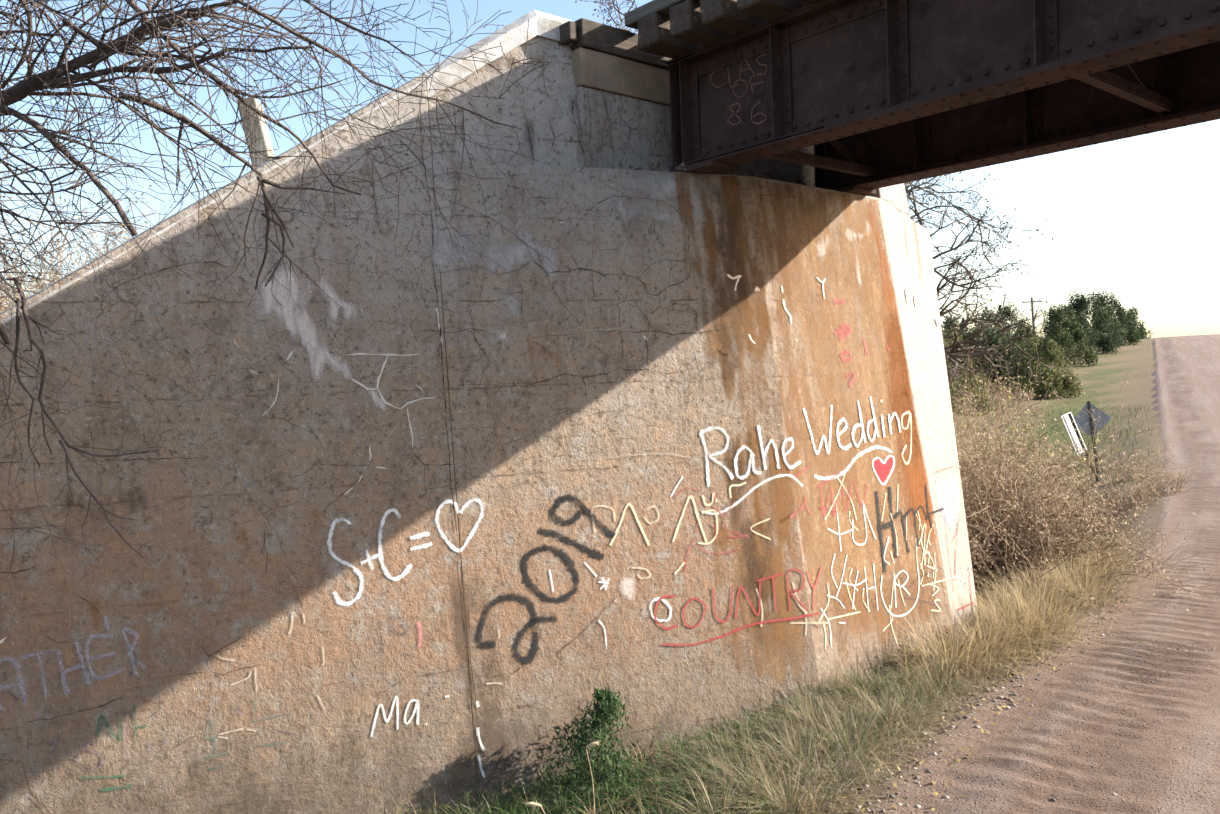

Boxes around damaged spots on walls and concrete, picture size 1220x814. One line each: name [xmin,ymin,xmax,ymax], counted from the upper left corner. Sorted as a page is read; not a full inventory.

crack [232,90,733,767]
corrosion [675,173,936,680]